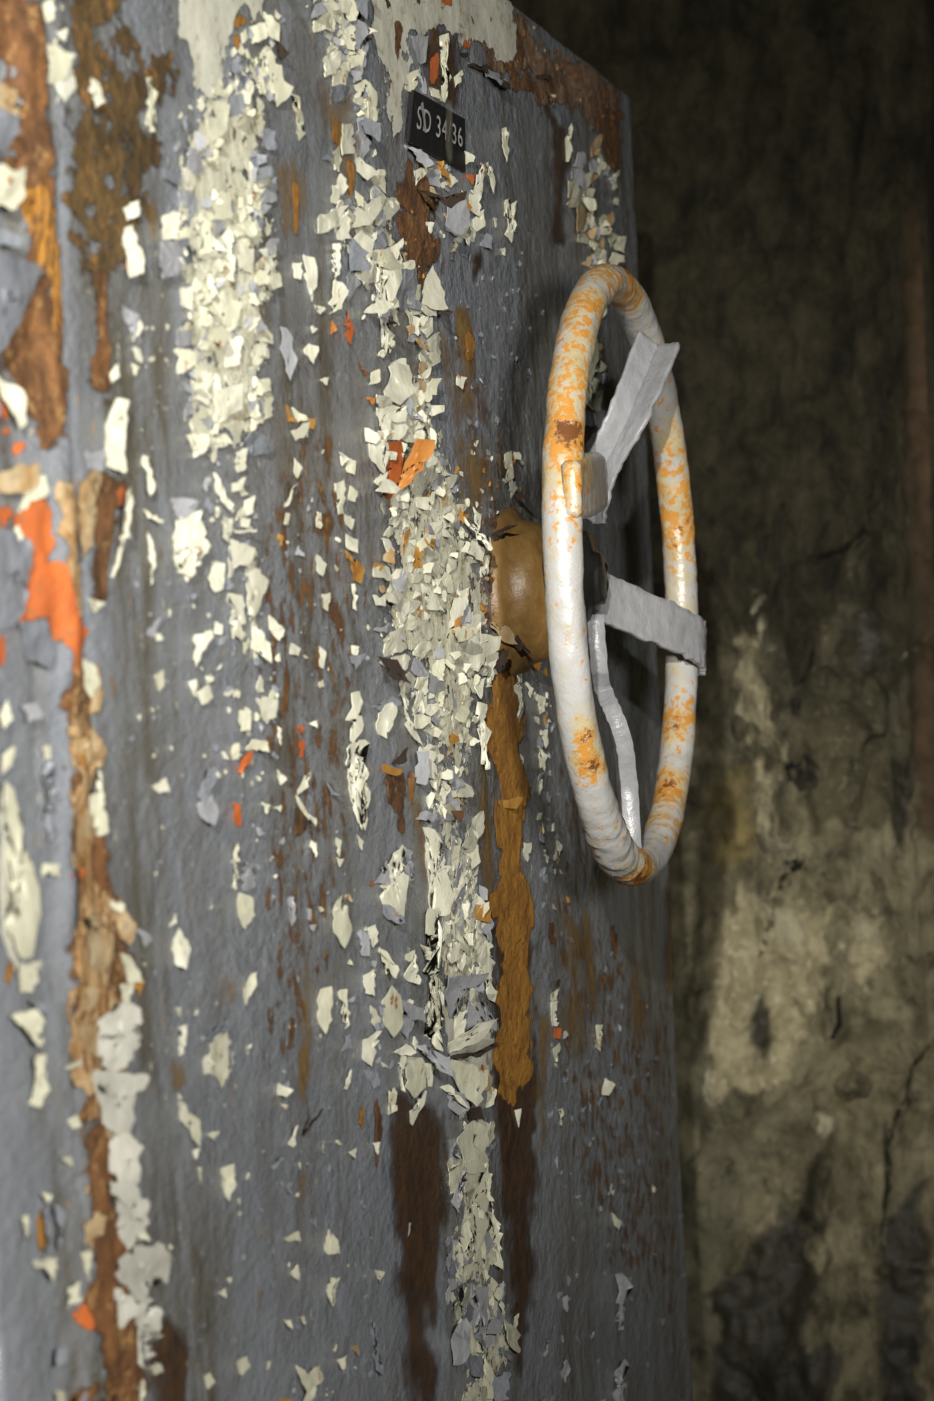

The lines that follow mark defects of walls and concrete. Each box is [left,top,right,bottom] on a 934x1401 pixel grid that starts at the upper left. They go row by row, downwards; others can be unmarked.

peeling [0,83,26,210]
peeling [42,0,106,108]
rust [464,2,625,244]
peeling [0,229,40,352]
rust [0,0,180,614]
peeling [115,0,574,1401]
rust [376,702,398,739]
rust [382,764,424,855]
peeling [0,379,268,1401]
rust [481,669,680,1372]
peeling [547,979,659,1127]
peeling [604,1270,633,1330]